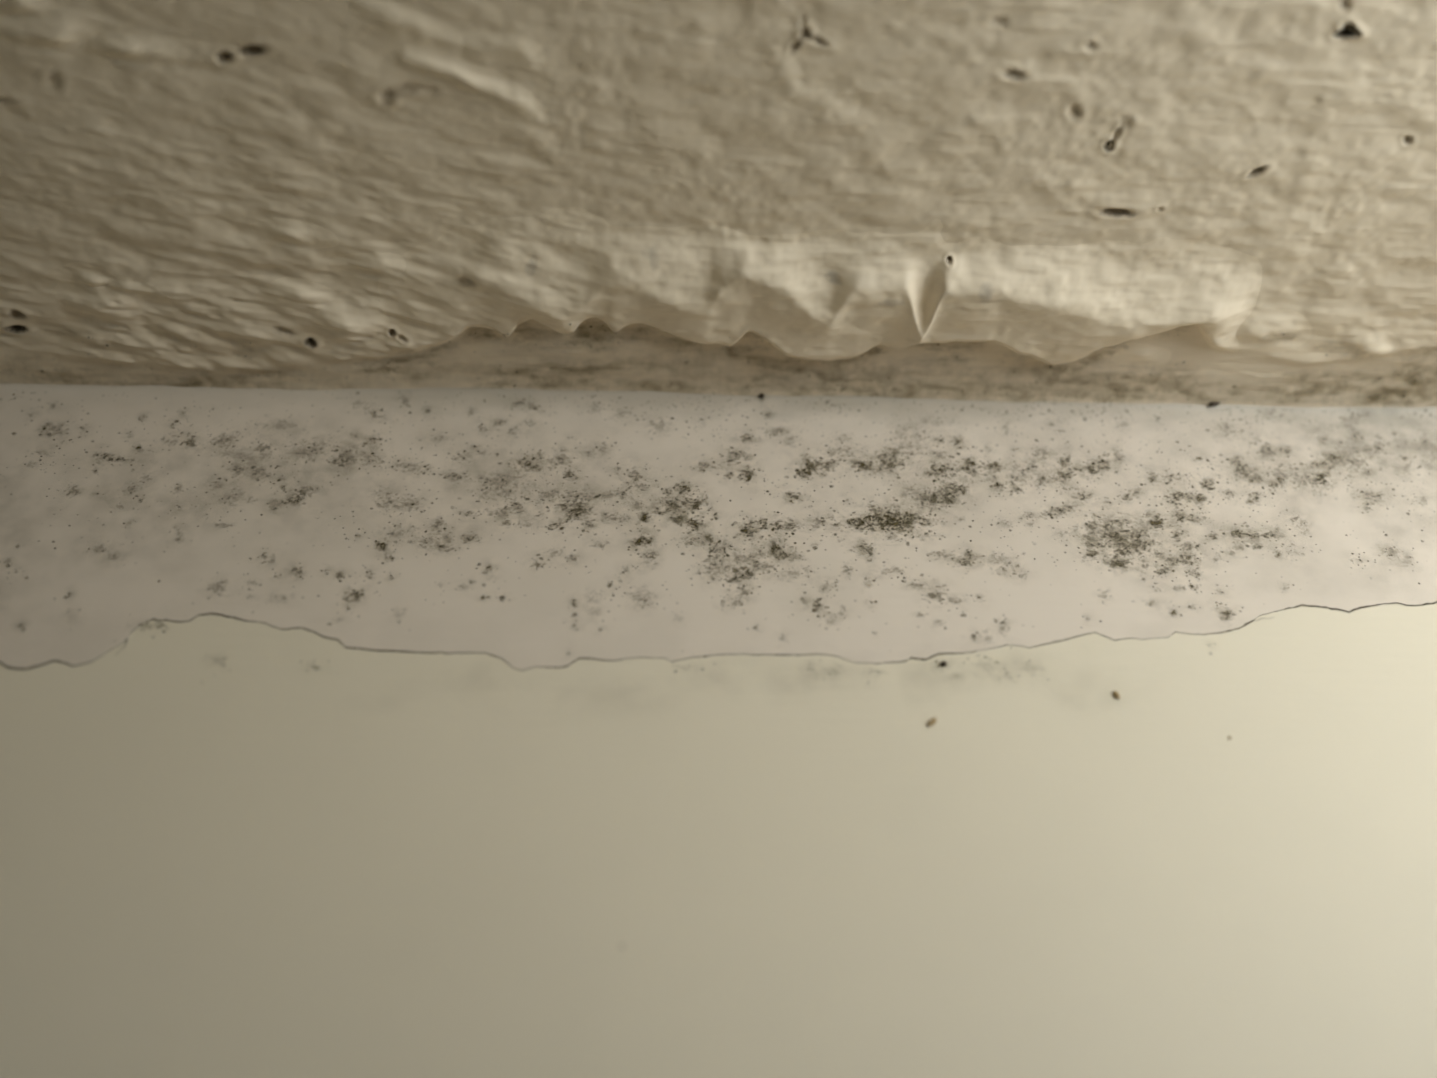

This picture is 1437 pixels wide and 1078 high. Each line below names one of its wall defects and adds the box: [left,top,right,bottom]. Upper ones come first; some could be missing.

water stain [519,457,600,530]
water stain [624,469,760,594]
water stain [741,445,903,560]
water stain [838,440,1013,551]
water stain [1087,470,1227,567]